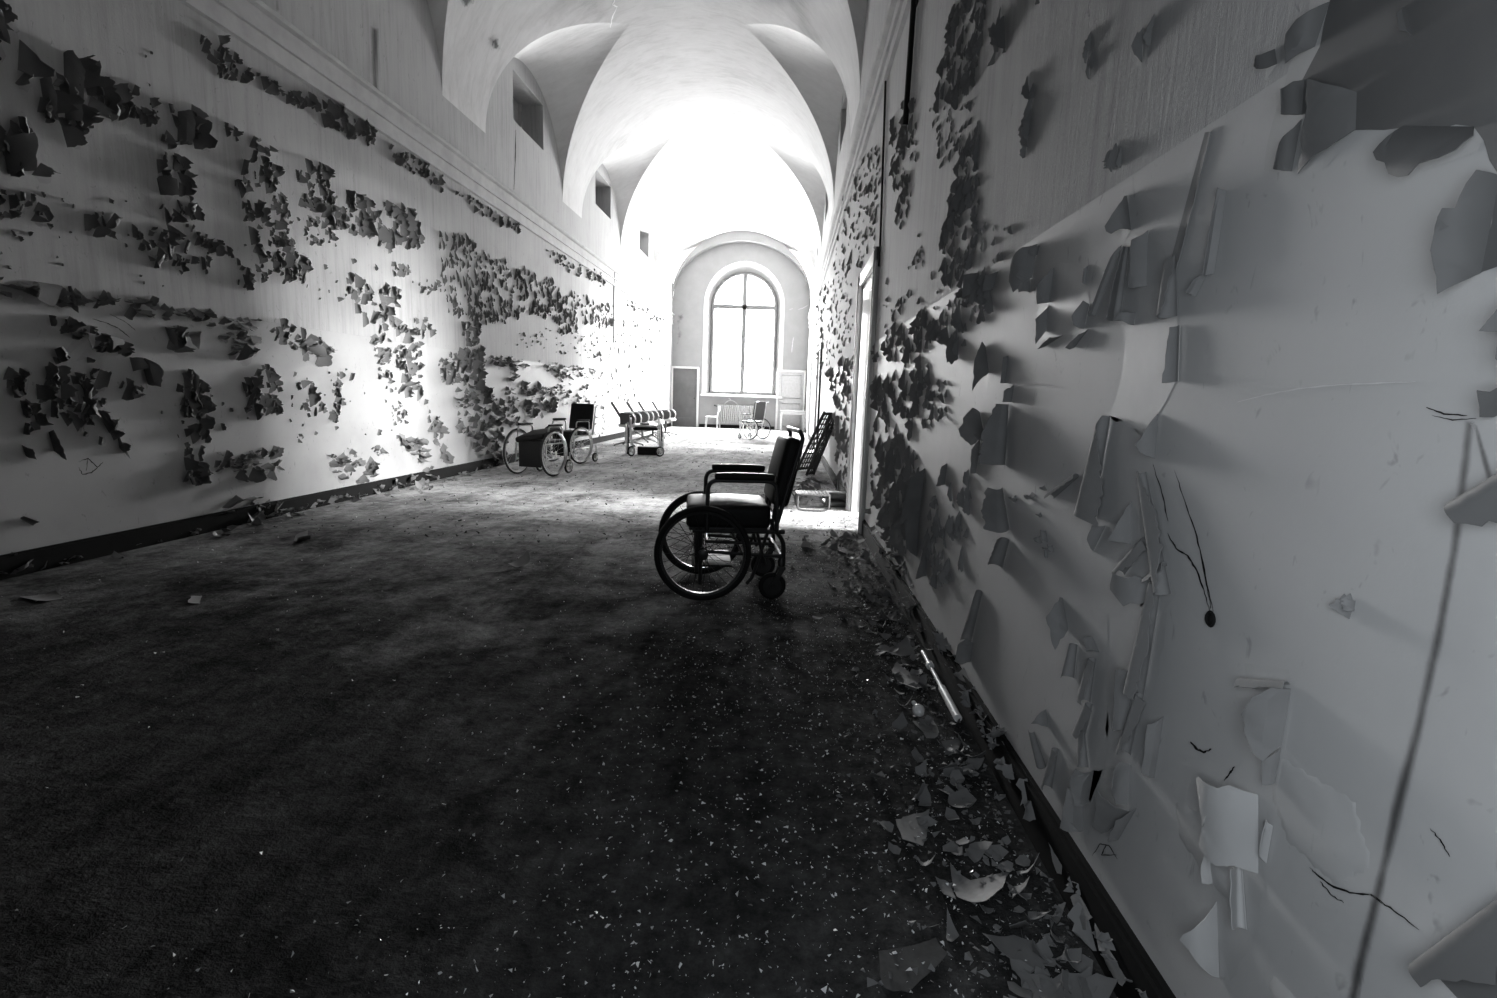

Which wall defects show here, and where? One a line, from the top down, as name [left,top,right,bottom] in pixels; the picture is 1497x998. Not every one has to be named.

peeling [1254,0,1497,294]
peeling [0,0,681,522]
peeling [1477,388,1497,417]
peeling [20,514,39,526]
peeling [800,0,1227,998]
peeling [1444,473,1497,527]
peeling [1329,593,1356,619]
peeling [1179,663,1291,980]
peeling [1408,899,1497,998]